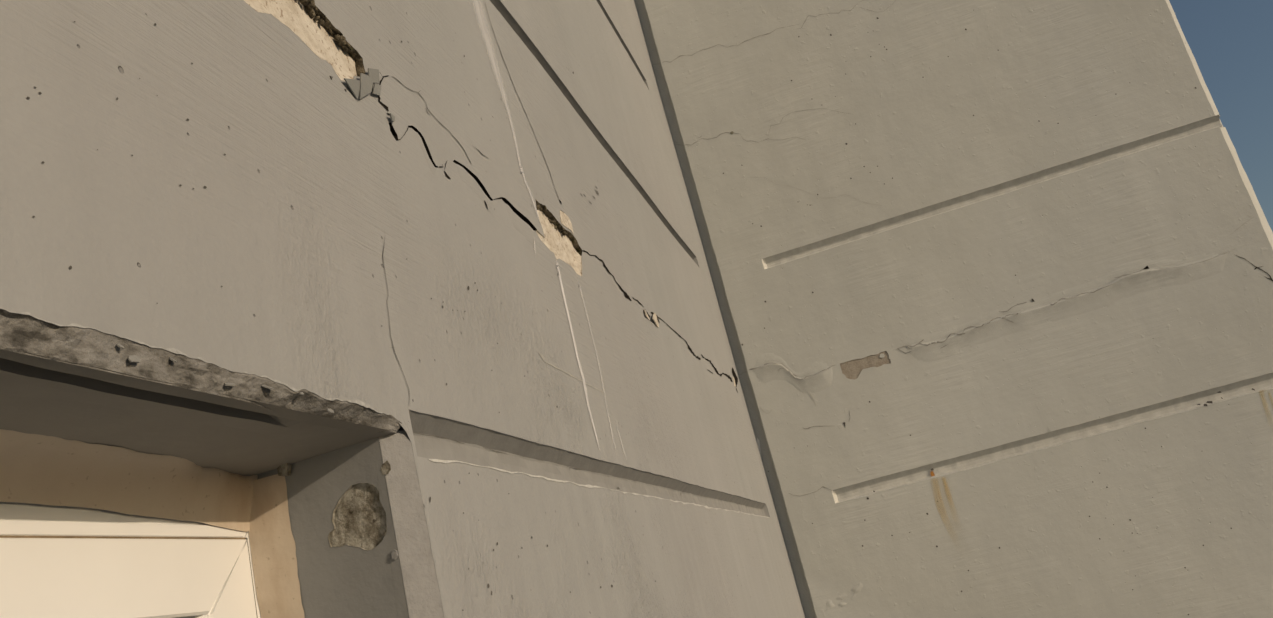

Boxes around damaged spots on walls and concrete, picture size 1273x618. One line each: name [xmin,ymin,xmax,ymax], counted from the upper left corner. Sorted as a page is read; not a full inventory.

crack [378,75,537,231]
spalling [535,200,582,276]
peeling [0,307,402,433]
crack [582,250,834,414]
spalling [840,351,891,380]
crack [897,249,1273,354]
spalling [328,460,391,551]